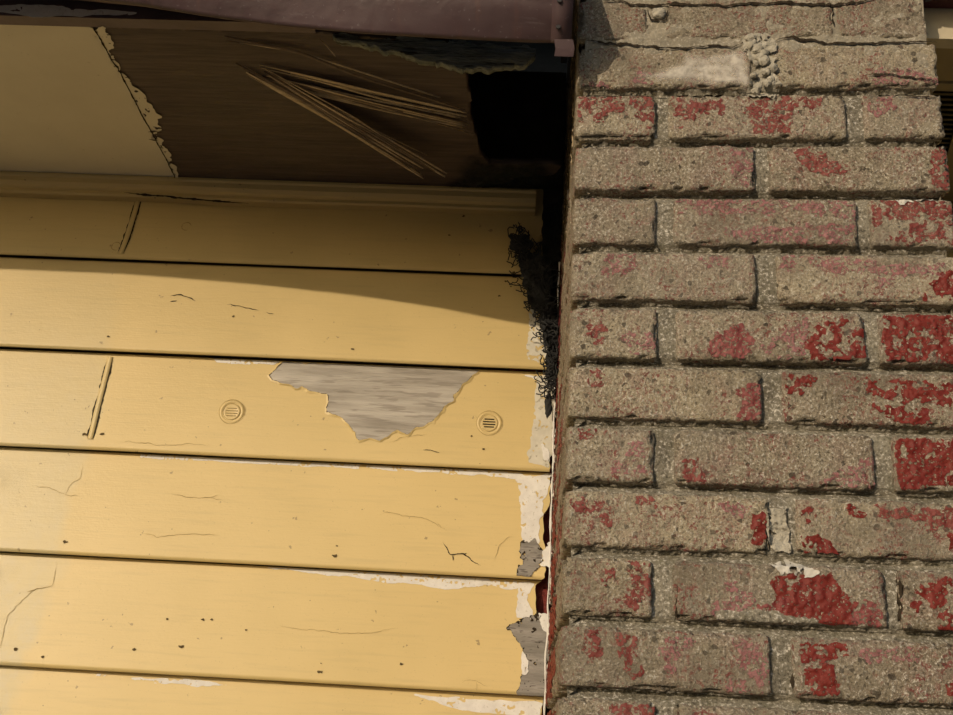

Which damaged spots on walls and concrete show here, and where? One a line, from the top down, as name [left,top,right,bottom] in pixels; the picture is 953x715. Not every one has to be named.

peeling [0,4,179,178]
damp [662,55,747,82]
peeling [742,33,822,134]
peeling [871,147,953,245]
peeling [808,256,953,301]
peeling [707,317,866,361]
peeling [881,314,953,364]
peeling [785,373,818,396]
peeling [863,376,953,425]
peeling [132,245,563,715]
peeling [894,437,953,490]
crack [384,512,508,565]